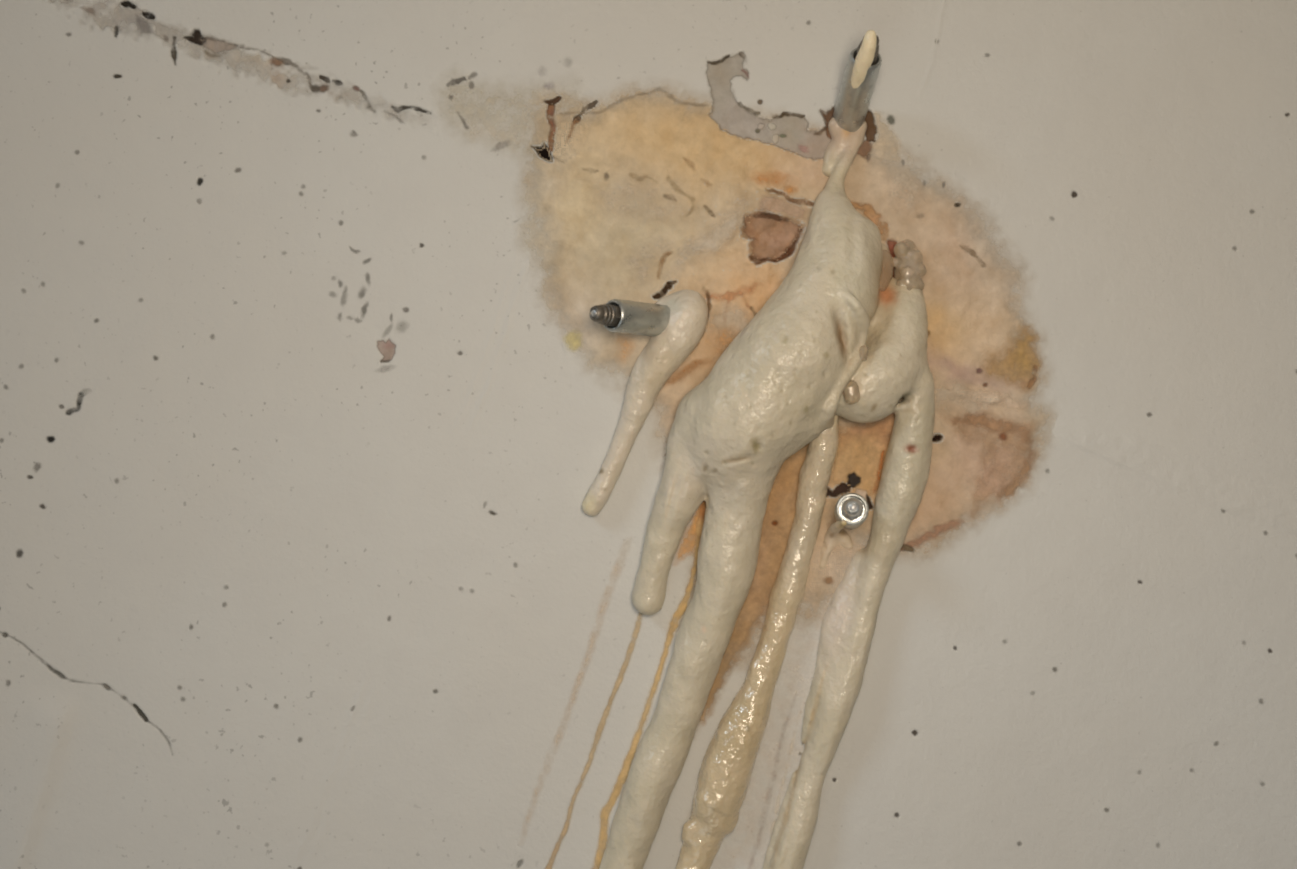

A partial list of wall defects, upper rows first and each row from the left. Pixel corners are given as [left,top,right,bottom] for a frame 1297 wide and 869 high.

crack [51,0,427,113]
peeling [706,52,834,160]
flaking render [857,140,871,157]
water stain [525,92,1048,551]
water stain [798,462,878,616]
crack [47,665,66,679]
crack [104,684,149,722]